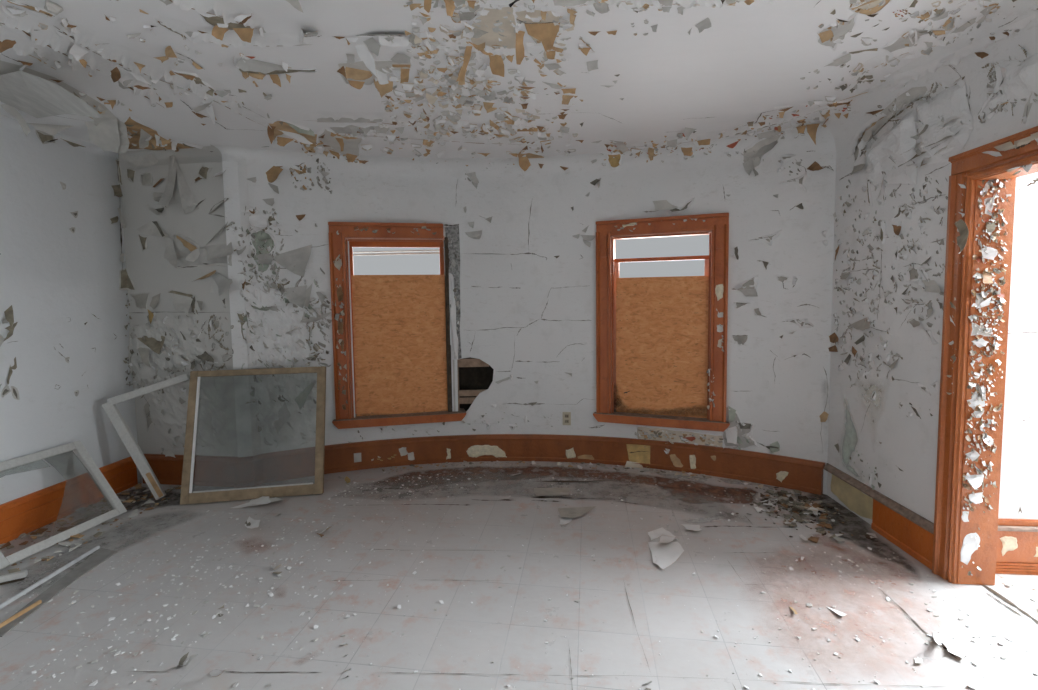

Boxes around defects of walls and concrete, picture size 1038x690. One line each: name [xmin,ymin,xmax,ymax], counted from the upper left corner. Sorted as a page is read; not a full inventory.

crack [472,203,582,289]
crack [470,286,594,406]
peeling [232,496,284,529]
peeling [960,527,982,576]
spalling [1000,536,1018,556]